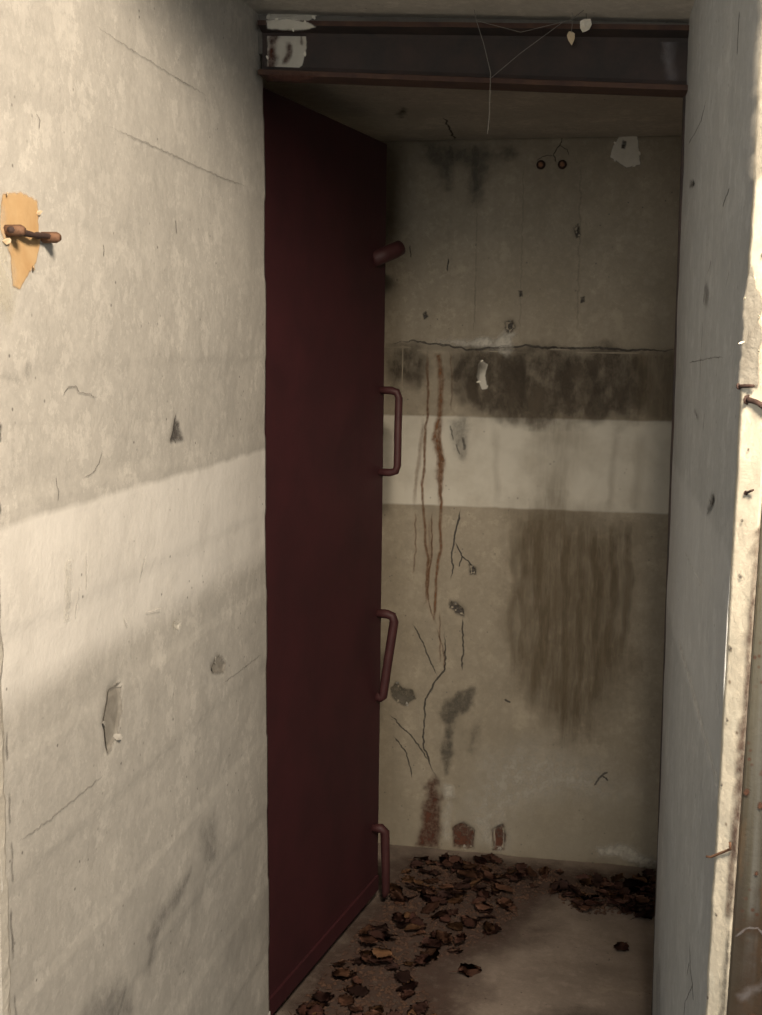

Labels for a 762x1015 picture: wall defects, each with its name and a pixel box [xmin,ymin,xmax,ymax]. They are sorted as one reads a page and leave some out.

peeling [0,192,43,289]
peeling [476,360,488,390]
crack [413,340,656,352]
damp [453,349,635,424]
peeling [738,267,762,386]
corrosion [421,355,445,613]
crack [451,512,475,576]
damp [522,519,618,722]
crack [392,621,464,775]
damp [441,689,474,770]
corrosion [727,585,755,913]
corrosion [419,779,441,847]